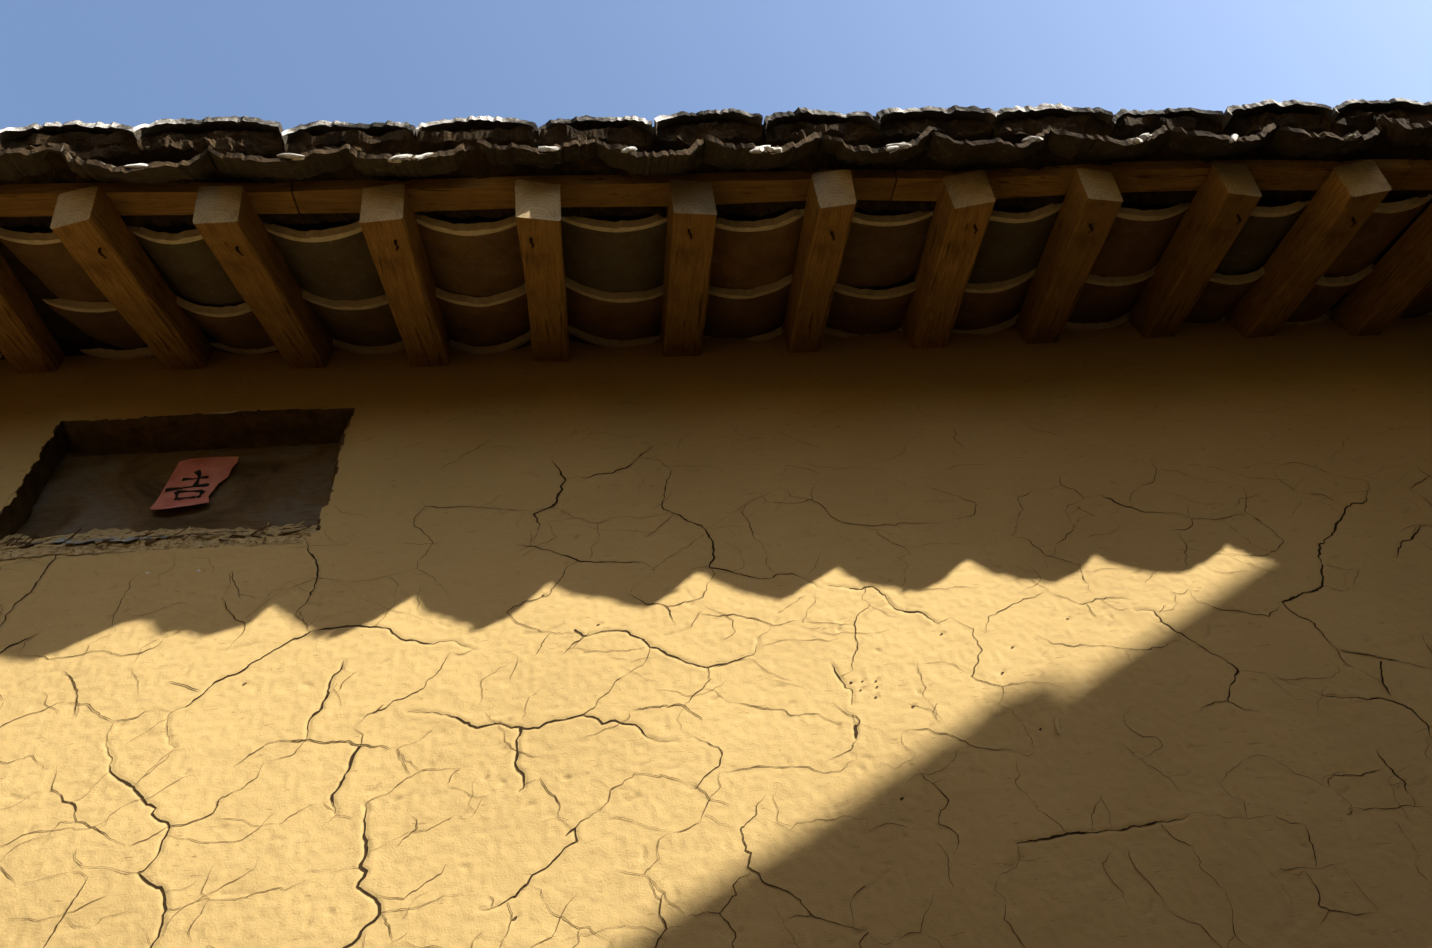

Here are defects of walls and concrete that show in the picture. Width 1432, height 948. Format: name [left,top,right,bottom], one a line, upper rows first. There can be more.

crack [0,394,1432,948]